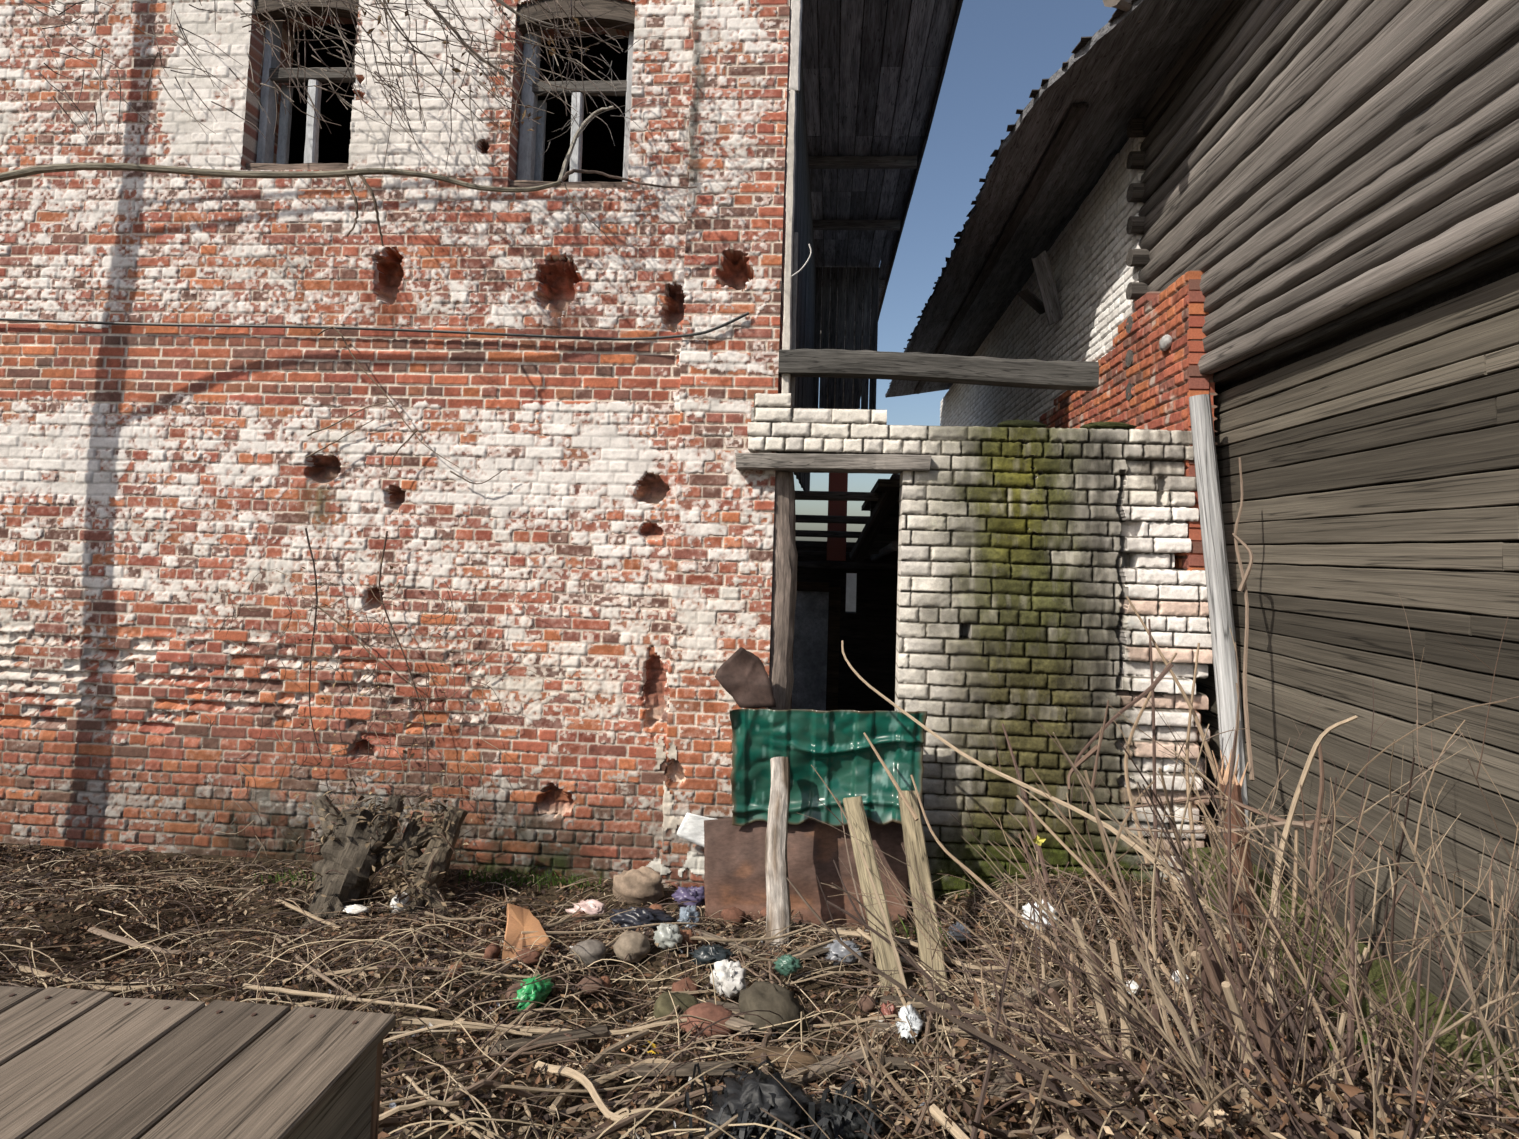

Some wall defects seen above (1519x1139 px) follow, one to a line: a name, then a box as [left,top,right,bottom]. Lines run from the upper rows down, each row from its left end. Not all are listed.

peeling [0,0,789,888]
damp [952,436,1125,883]